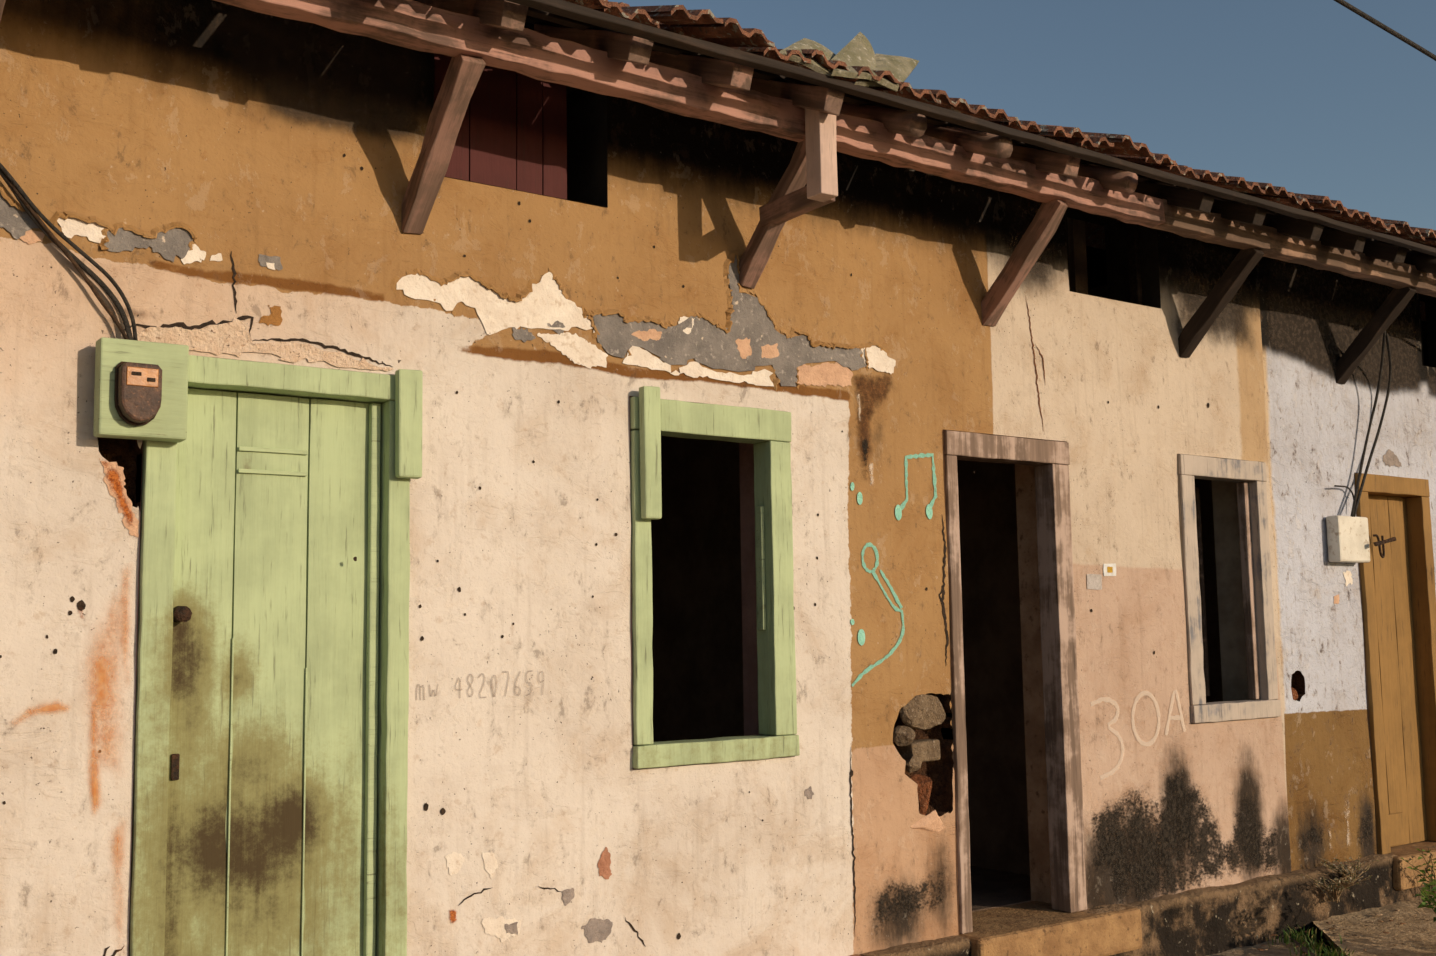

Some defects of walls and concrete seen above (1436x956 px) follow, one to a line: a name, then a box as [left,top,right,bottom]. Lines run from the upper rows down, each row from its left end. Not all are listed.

peeling [0,185,222,264]
peeling [258,254,283,270]
flaking render [137,305,393,371]
peeling [390,250,896,392]
leakage [855,377,891,483]
spalling [101,461,140,537]
rust [29,704,65,714]
rust [91,656,111,807]
spalling [893,694,946,832]
leakage [1092,772,1280,904]
leakage [876,873,943,927]